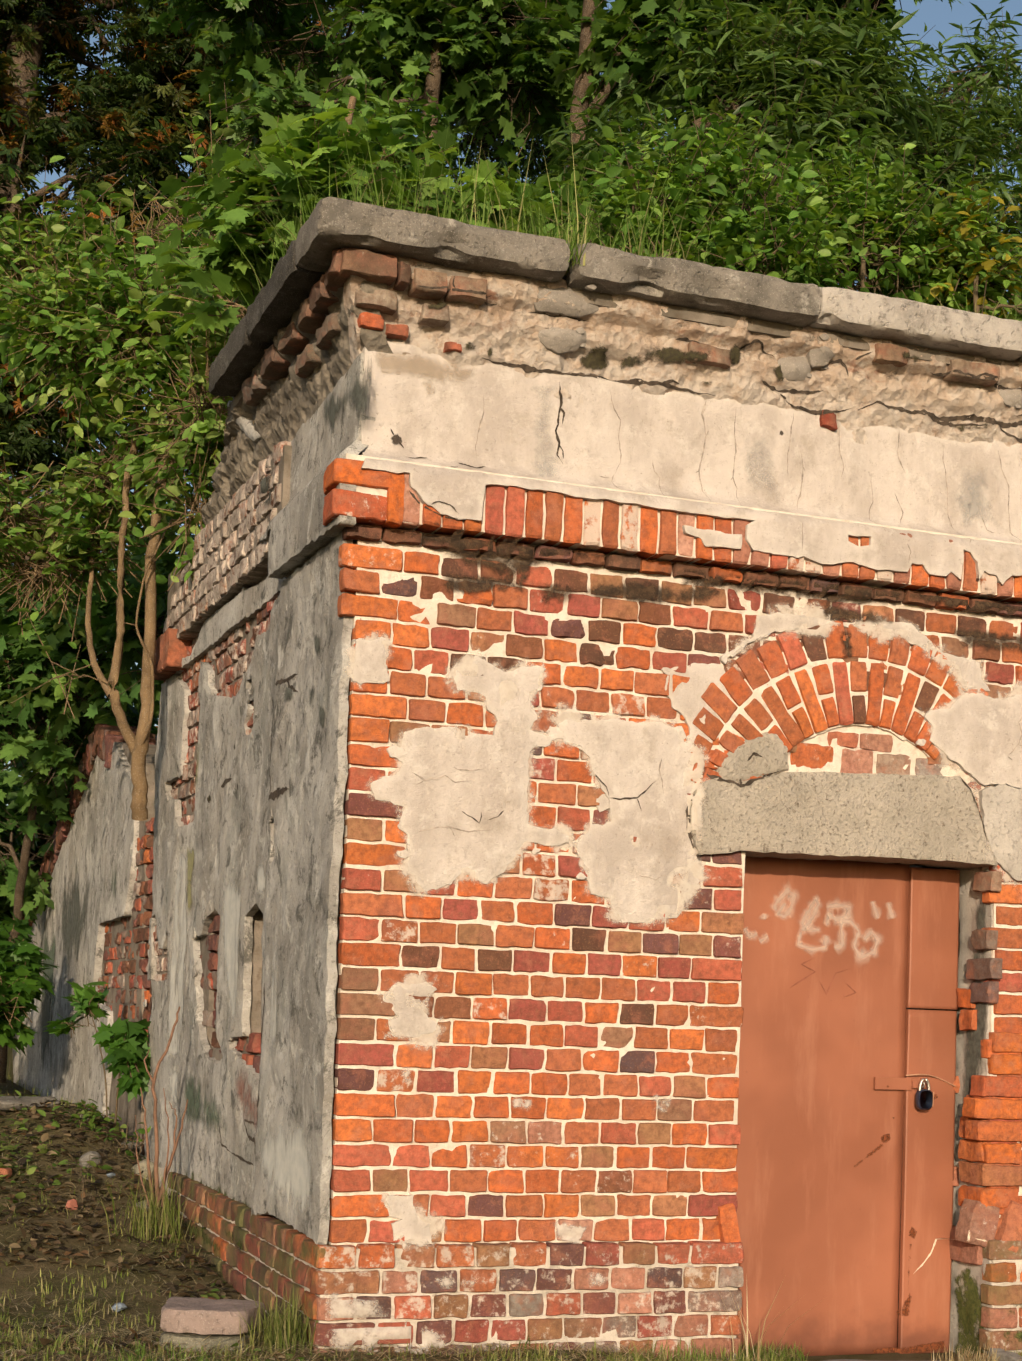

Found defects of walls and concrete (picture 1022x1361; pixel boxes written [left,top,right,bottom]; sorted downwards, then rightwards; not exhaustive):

crack [676,336,699,344]
crack [459,398,486,468]
crack [484,358,740,502]
crack [740,339,1022,559]
crack [410,492,459,519]
flaking render [346,632,391,686]
spalling [166,597,277,825]
flaking render [370,605,1022,924]
flaking render [381,973,441,1049]
rust [855,1117,894,1166]
flaking render [382,1193,444,1249]